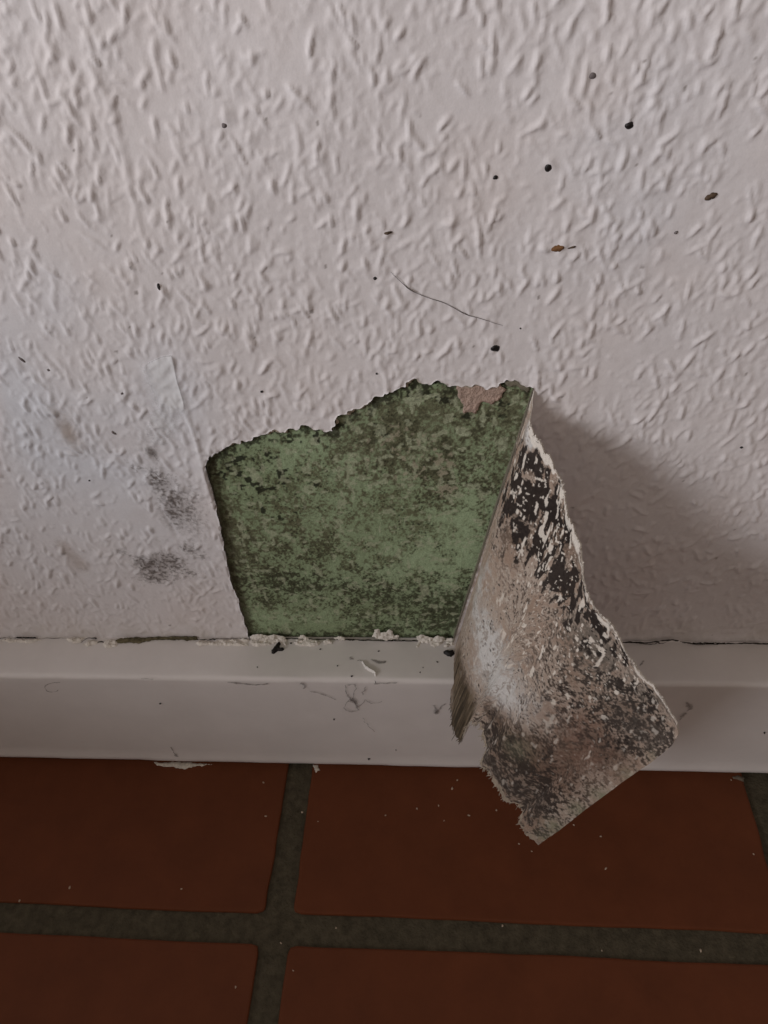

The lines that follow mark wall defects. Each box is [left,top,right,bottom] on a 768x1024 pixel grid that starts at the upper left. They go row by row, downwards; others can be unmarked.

leakage [150,475,192,525]
peeling [207,379,533,648]
leakage [135,548,190,581]